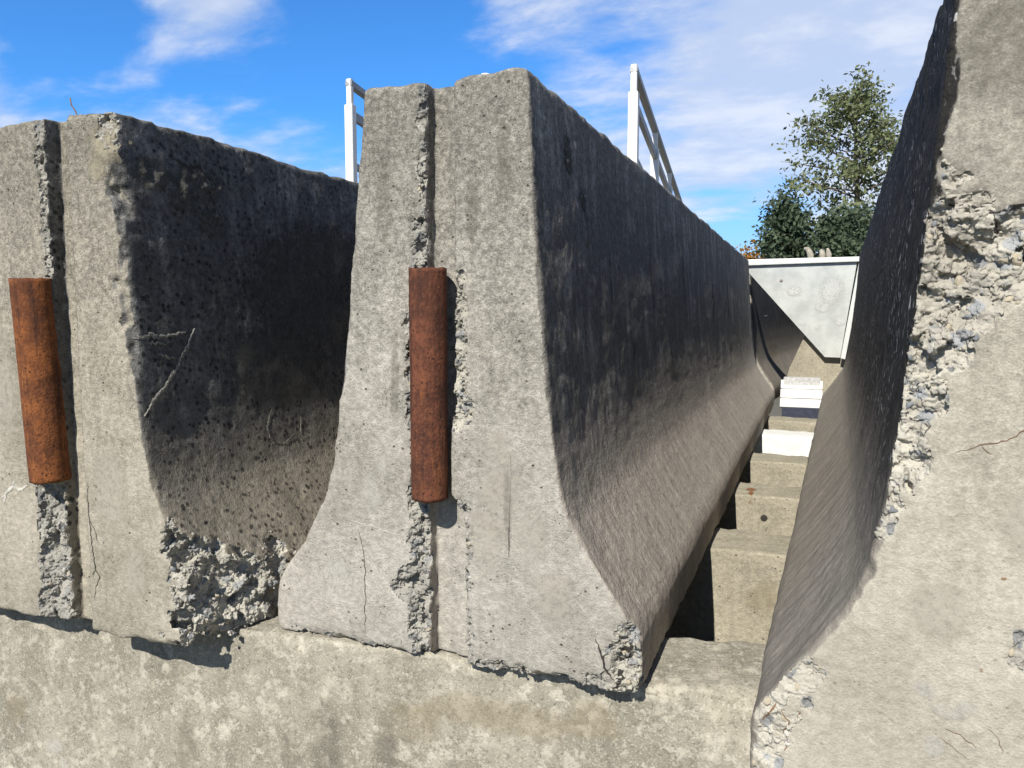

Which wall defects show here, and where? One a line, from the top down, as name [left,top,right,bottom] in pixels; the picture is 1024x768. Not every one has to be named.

spalling [32,121,54,278]
spalling [409,84,430,268]
spalling [874,148,1024,541]
spalling [35,482,81,621]
spalling [159,516,297,646]
spalling [390,311,434,654]
spalling [455,498,646,693]